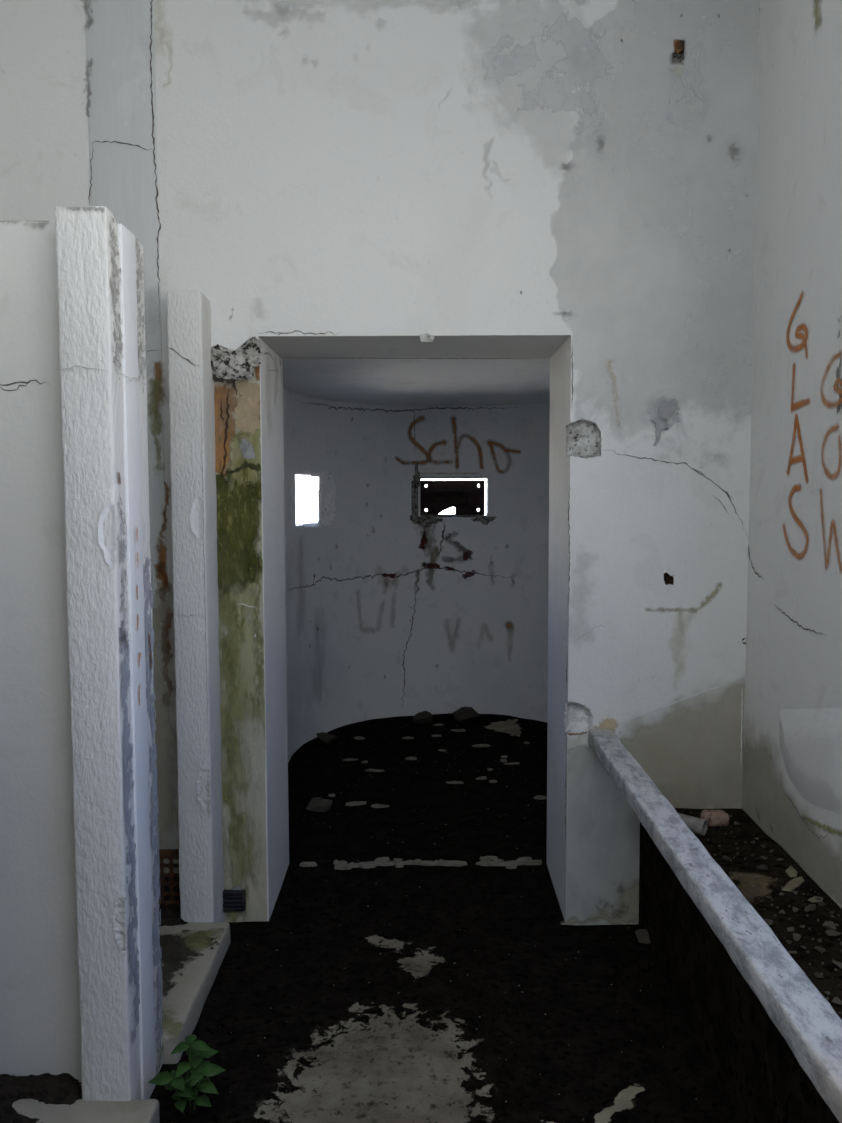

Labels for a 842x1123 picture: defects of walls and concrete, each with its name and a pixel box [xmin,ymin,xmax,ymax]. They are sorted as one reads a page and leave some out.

crack [88,0,200,366]
crack [0,365,147,391]
spalling [211,337,262,480]
flaking render [221,485,267,922]
crack [292,525,514,703]
spalling [565,419,602,459]
crack [566,475,606,688]
crack [612,450,764,579]
crack [775,605,827,636]
leakage [621,684,842,906]